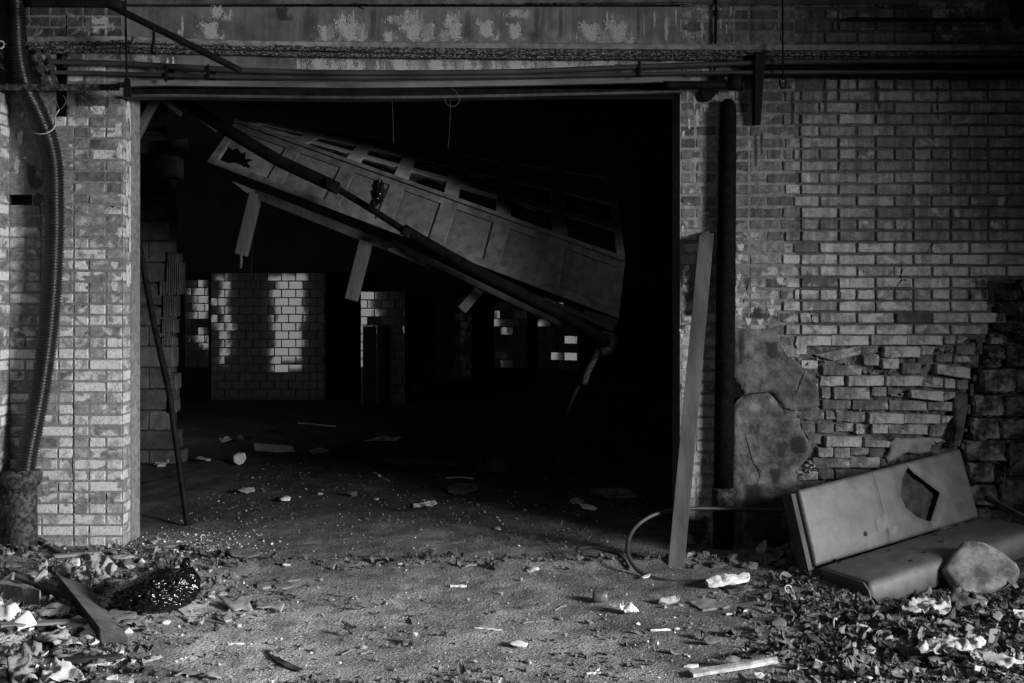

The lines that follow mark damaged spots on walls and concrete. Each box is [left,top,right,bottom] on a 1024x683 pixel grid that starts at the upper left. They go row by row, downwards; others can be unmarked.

peeling [314,10,371,41]
peeling [383,9,464,42]
peeling [475,9,529,41]
peeling [576,15,637,43]
peeling [296,57,617,70]
flaking render [734,380,743,405]
crack [743,371,805,413]
spalling [794,335,1002,489]